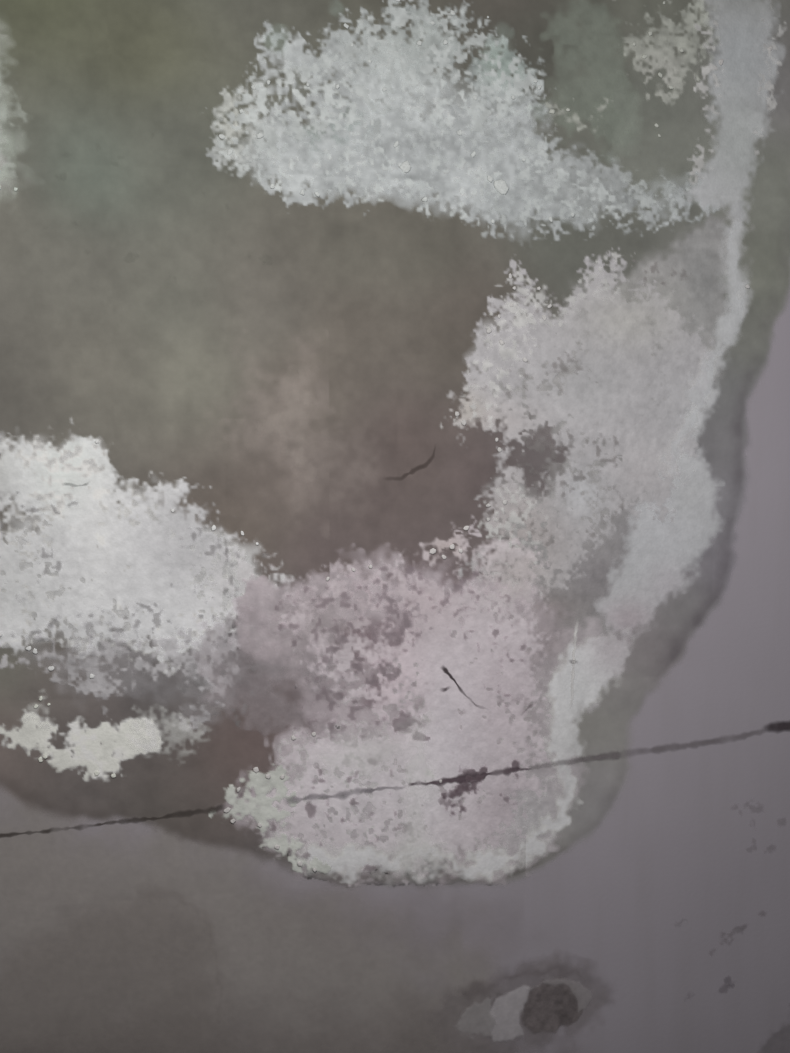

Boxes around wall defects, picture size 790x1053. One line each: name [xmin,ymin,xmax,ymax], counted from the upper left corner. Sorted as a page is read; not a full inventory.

damp [281,100,310,117]
damp [225,131,250,149]
damp [0,504,21,535]
damp [476,559,523,588]
damp [351,619,405,651]
crack [768,722,790,731]
crack [579,753,619,761]
crack [411,760,528,814]
crack [77,806,222,828]
crack [0,829,51,837]
damp [0,629,492,1053]
spalling [432,956,608,1053]